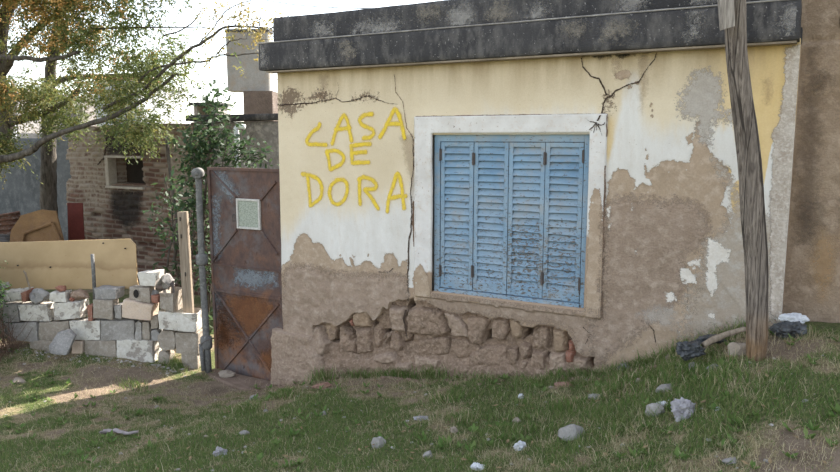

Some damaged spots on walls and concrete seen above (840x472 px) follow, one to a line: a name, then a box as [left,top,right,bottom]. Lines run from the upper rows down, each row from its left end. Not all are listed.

damp [340,23,397,58]
crack [456,111,555,119]
crack [581,53,657,137]
crack [277,75,430,337]
flaking render [233,121,743,378]
crack [599,166,607,318]